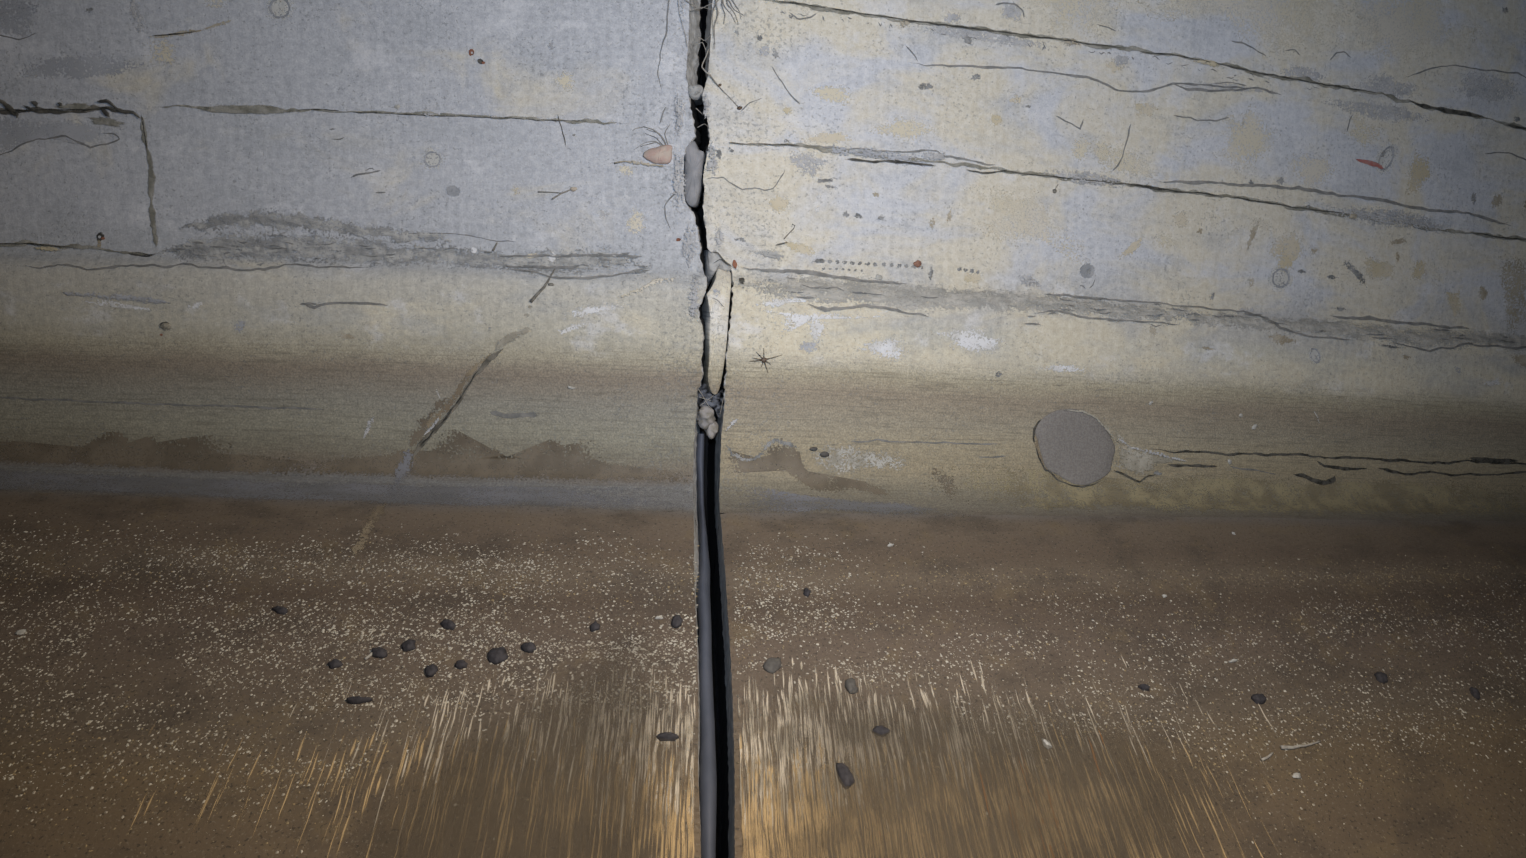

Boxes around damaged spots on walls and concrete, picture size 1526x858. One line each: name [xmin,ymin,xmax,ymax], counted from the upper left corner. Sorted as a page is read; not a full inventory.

crack [996,2,1024,16]
crack [657,0,670,123]
crack [742,67,800,110]
crack [906,41,1350,170]
crack [1408,65,1526,78]
crack [664,173,784,227]
crack [409,233,513,242]
crack [1158,449,1526,485]